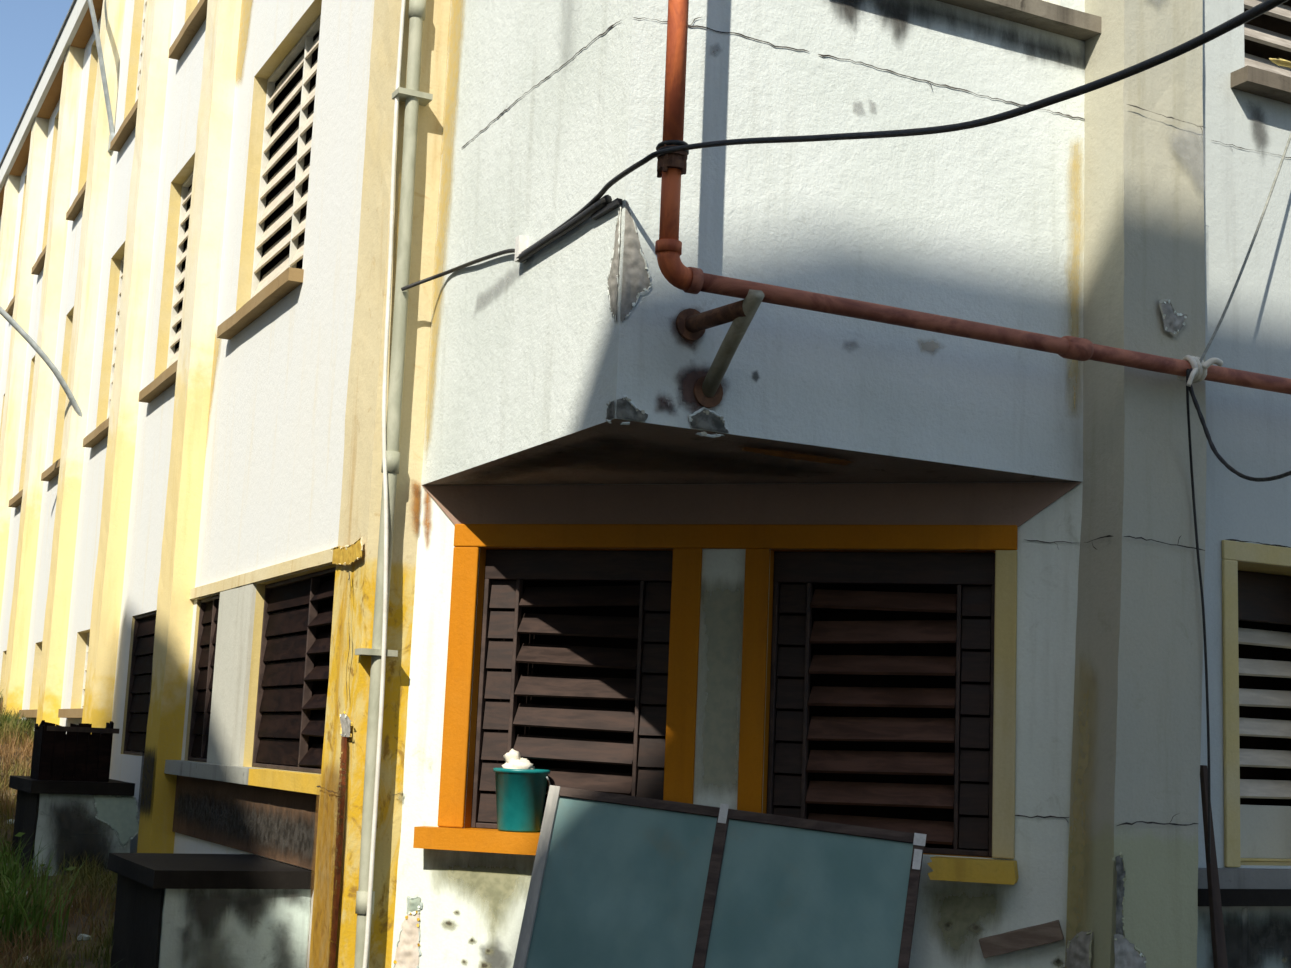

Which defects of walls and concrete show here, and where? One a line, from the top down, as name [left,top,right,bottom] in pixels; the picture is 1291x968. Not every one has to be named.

water stain [833,0,1081,63]
crack [462,17,1085,148]
flaking render [607,201,652,322]
rust [1071,146,1080,337]
flaking render [605,395,648,425]
rust [658,368,713,412]
crack [1027,535,1291,551]
water stain [53,803,110,875]
water stain [175,793,317,862]
crack [1117,813,1198,826]
water stain [184,889,300,968]
flaking render [393,896,423,968]